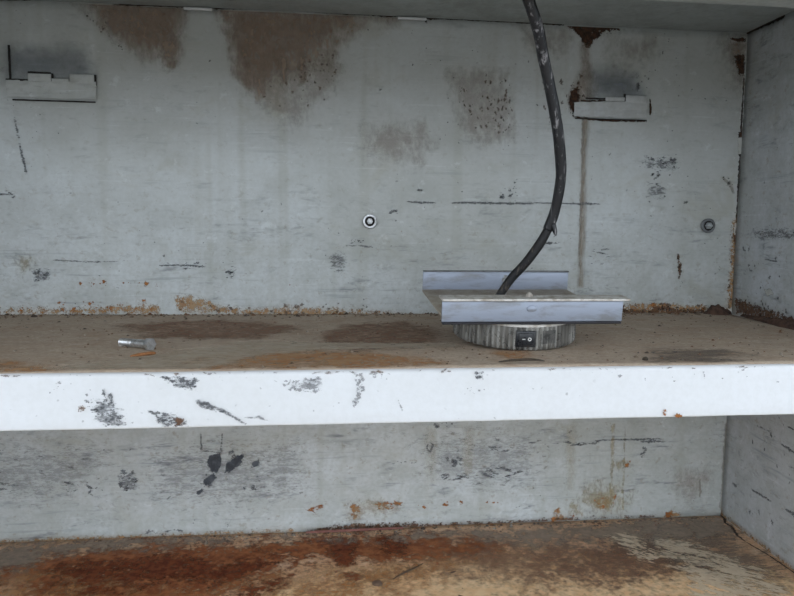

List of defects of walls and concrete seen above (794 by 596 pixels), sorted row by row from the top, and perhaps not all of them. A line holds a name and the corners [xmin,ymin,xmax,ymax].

rust [568,26,620,52]
rust [730,37,746,76]
rust [559,62,652,122]
rust [726,218,793,319]
rust [622,302,708,313]
rust [0,295,451,377]
peeling [162,376,200,389]
peeling [78,390,133,427]
peeling [197,451,244,495]
rust [0,495,708,596]